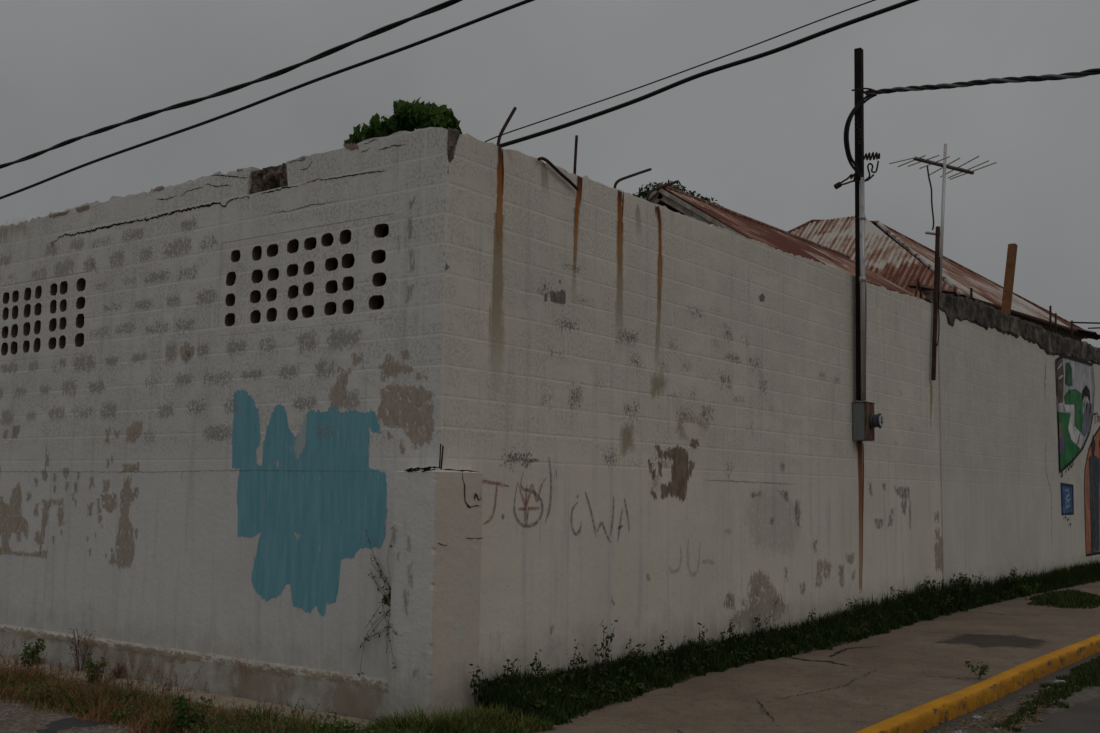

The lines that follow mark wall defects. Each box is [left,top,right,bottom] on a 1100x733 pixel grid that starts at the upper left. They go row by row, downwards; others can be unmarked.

crack [50,139,406,247]
spalling [236,163,288,198]
corrosion [492,147,504,330]
corrosion [573,176,582,272]
peeling [377,349,434,453]
peeling [0,421,142,569]
peeling [648,439,699,502]
corrosion [856,441,864,590]